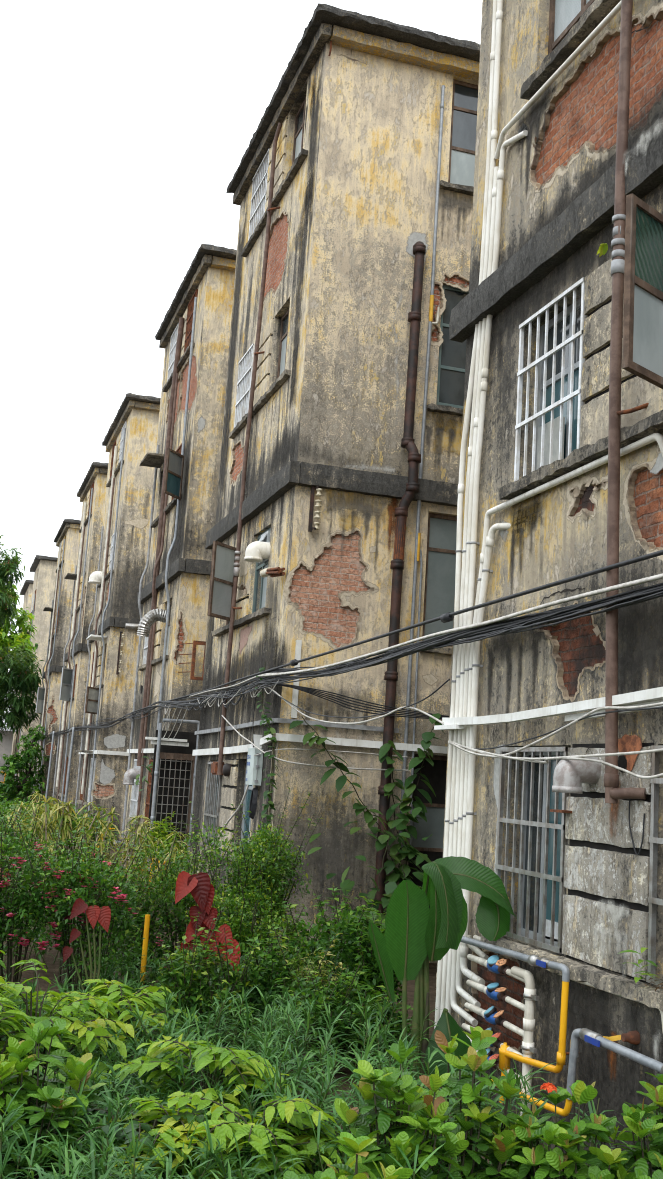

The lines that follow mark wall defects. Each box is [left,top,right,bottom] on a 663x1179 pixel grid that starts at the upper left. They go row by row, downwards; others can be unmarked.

flaking render [528,2,663,193]
damp [289,75,321,417]
flaking render [427,272,469,346]
rust [388,498,398,548]
flaking render [566,474,608,523]
flaking render [622,451,663,561]
damp [116,562,143,618]
flaking render [283,514,379,651]
damp [301,691,370,735]
damp [488,625,541,733]
flaking render [538,600,606,703]
damp [600,903,624,922]